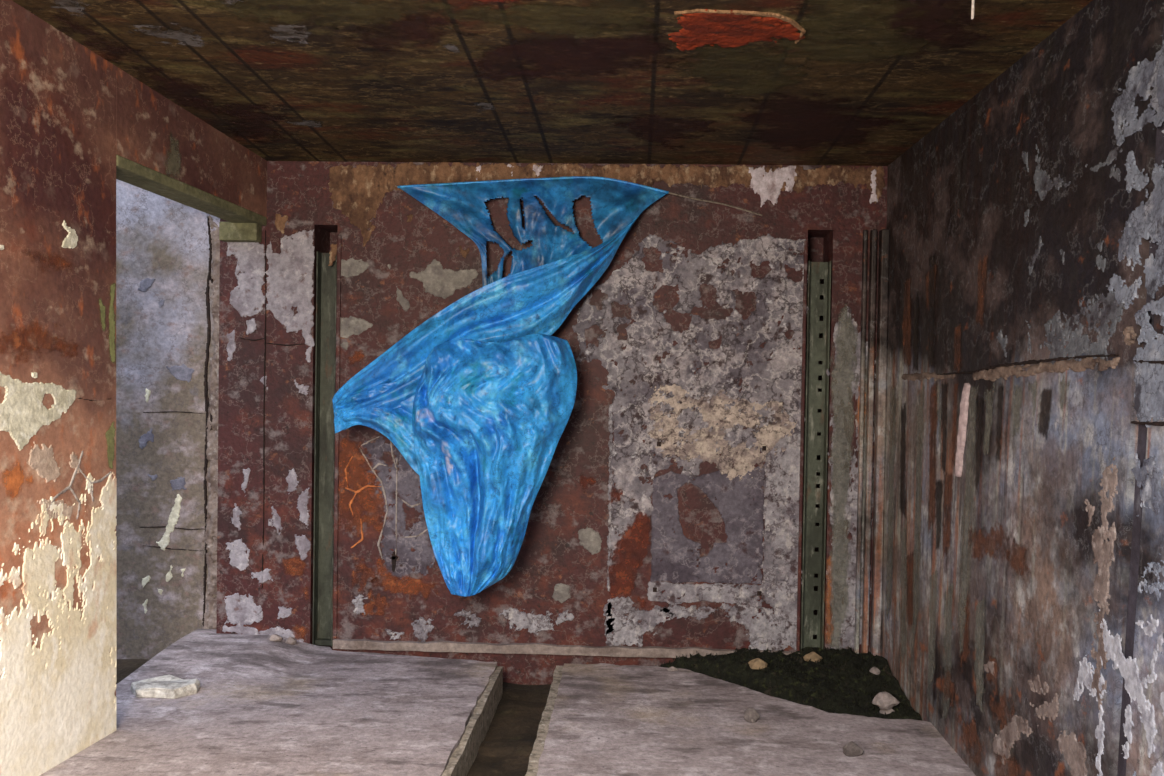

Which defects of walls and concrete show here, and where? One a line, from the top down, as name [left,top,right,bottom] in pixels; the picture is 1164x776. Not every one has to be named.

peeling [328,162,885,278]
peeling [902,35,1164,477]
peeling [0,372,117,776]
peeling [202,213,315,642]
rust [333,437,388,537]
rust [351,559,437,616]
rust [608,512,651,608]
peeling [572,234,809,651]
water stain [829,307,873,650]
rust [929,326,961,556]
water stain [886,376,1069,717]
rust [970,526,1029,575]